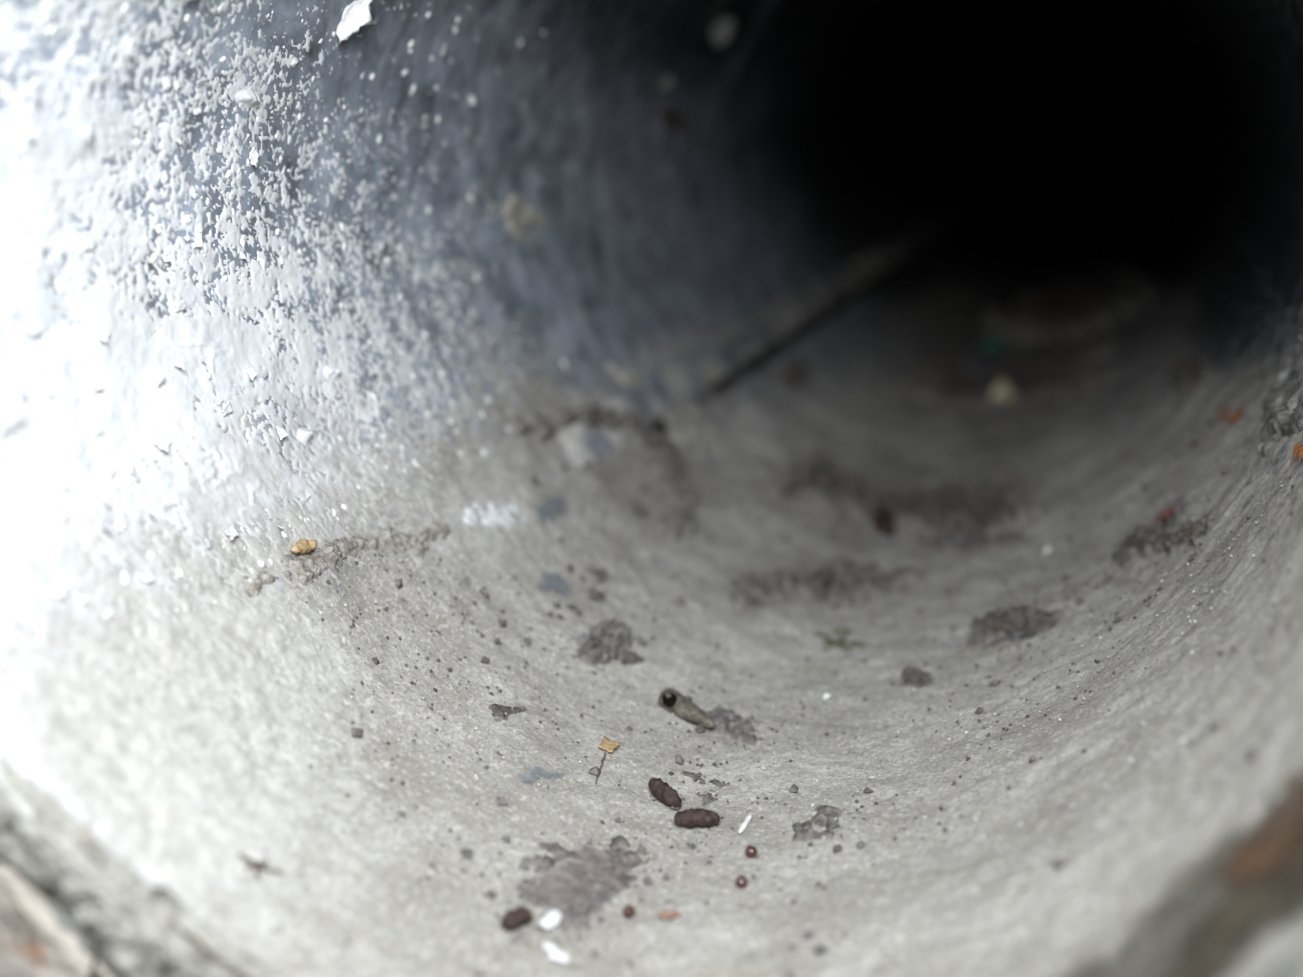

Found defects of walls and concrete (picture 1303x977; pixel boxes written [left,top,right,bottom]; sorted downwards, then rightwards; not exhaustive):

peeling [0,0,713,963]